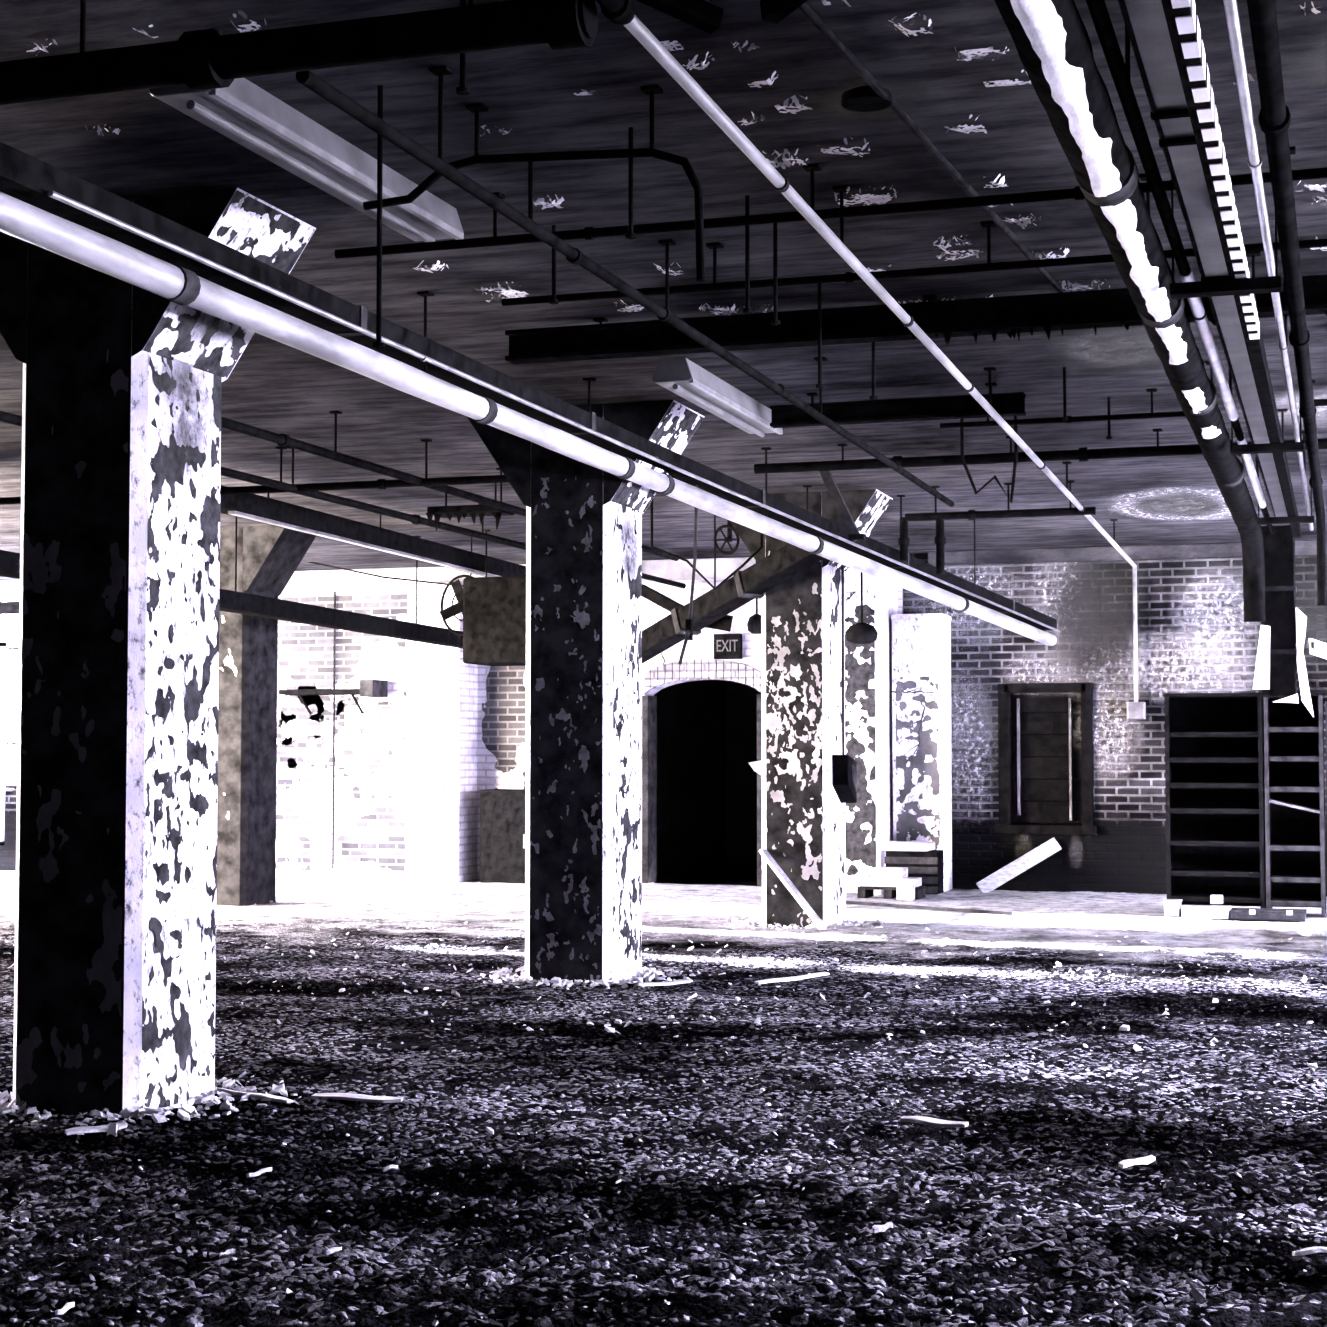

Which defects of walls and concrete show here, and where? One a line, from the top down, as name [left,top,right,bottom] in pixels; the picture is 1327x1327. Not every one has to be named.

peeling [193,326,246,432]
peeling [147,423,206,564]
peeling [184,485,237,773]
peeling [276,620,383,871]
peeling [278,592,408,620]
peeling [619,799,641,960]
peeling [766,634,822,783]
peeling [796,819,822,880]
peeling [828,561,876,717]
peeling [845,721,876,877]
peeling [896,713,940,850]
peeling [142,982,197,1074]